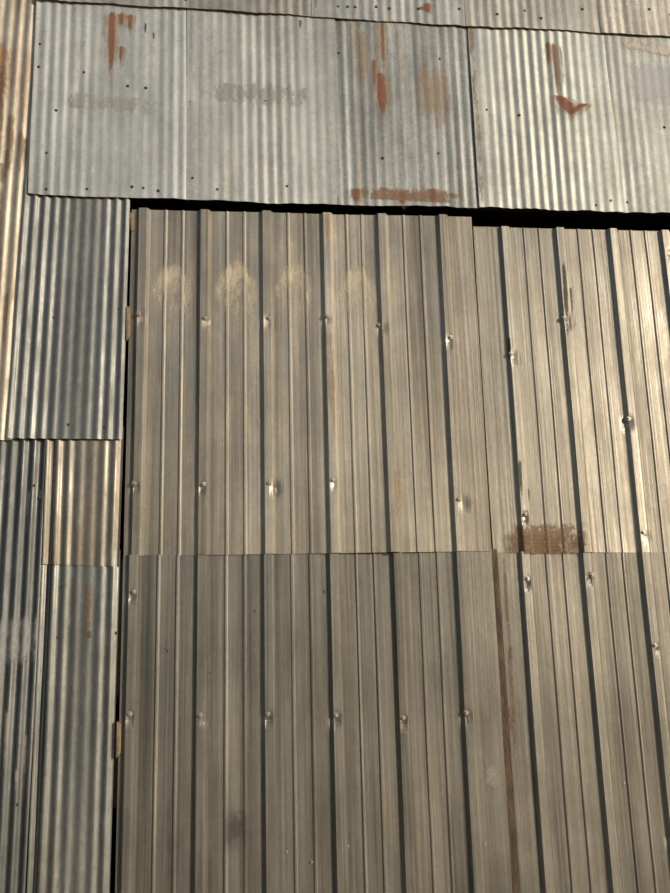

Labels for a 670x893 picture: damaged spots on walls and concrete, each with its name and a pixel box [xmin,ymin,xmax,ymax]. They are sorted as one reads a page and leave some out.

corrosion [108,13,133,68]
corrosion [372,21,386,113]
corrosion [546,42,587,113]
corrosion [353,187,459,203]
corrosion [507,525,585,554]